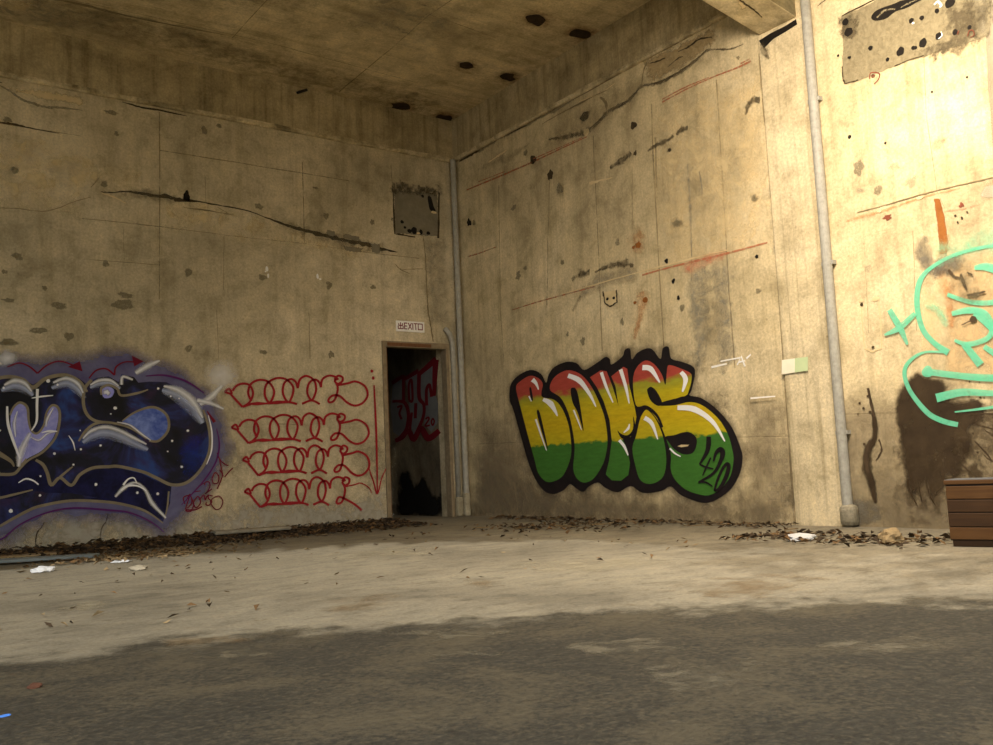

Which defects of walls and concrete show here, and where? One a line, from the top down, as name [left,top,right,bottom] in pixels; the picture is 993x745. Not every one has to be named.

crack [548,0,797,140]
crack [2,177,434,342]
corrosion [857,177,993,254]
peeling [949,266,993,372]
damp [846,373,993,529]